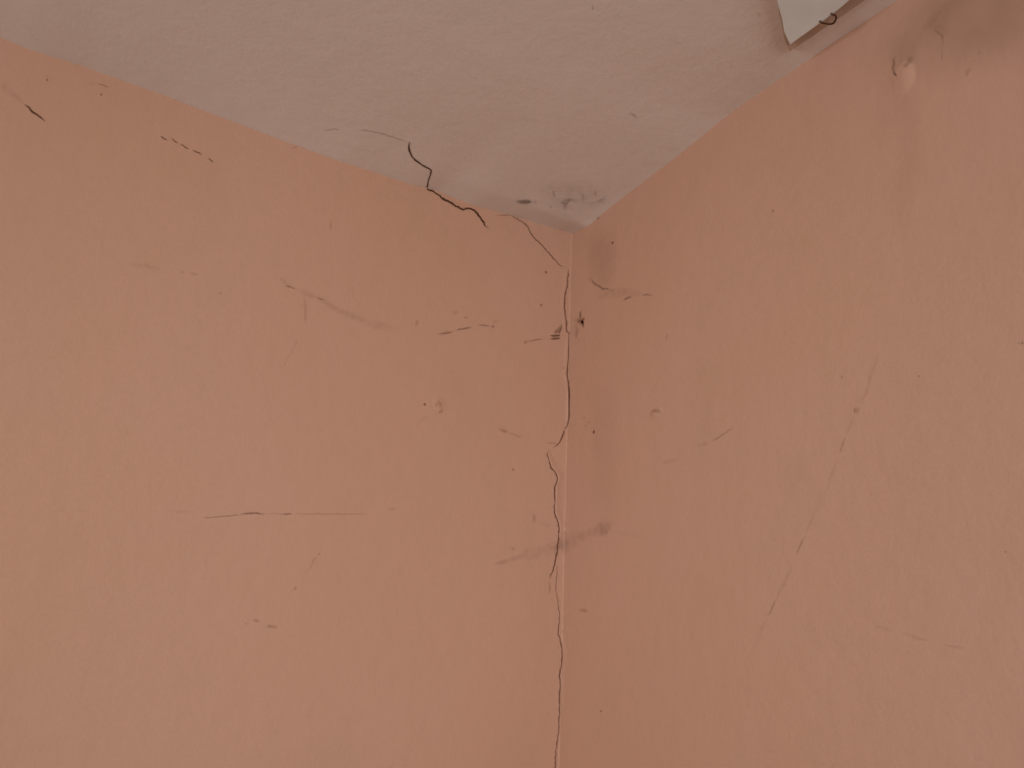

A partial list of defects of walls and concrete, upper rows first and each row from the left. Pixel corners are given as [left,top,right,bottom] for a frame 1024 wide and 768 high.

crack [408,144,486,227]
crack [547,269,570,576]
crack [555,600,568,768]